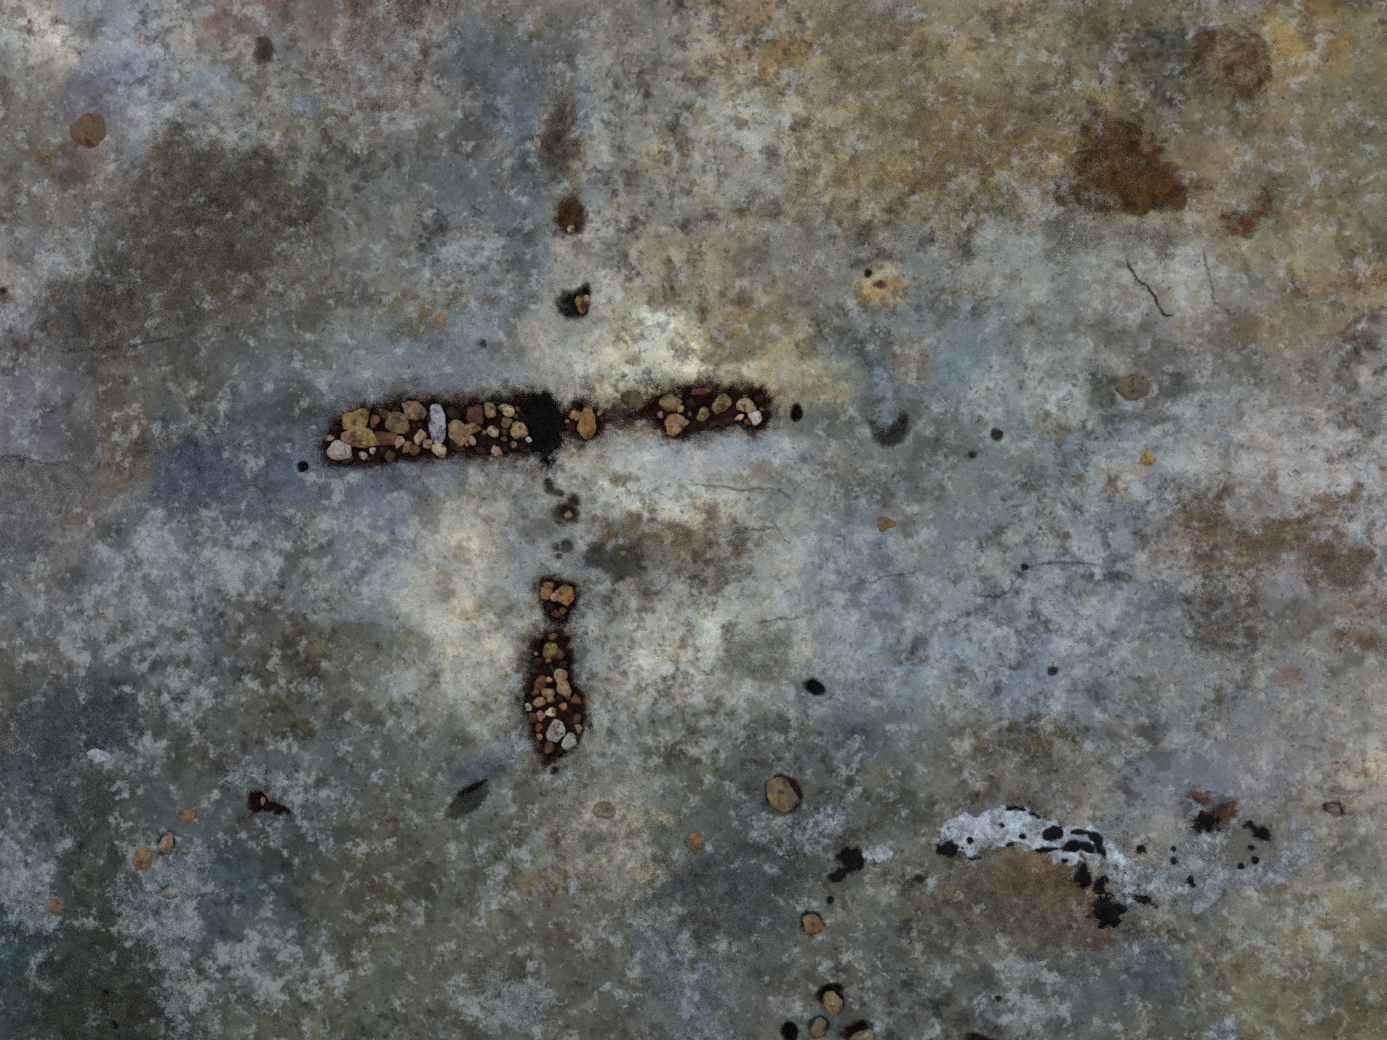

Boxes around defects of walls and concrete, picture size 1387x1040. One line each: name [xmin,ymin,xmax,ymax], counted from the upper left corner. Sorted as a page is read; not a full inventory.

corrosion [1054,119,1202,216]
spalling [298,381,802,774]
efflorescence [936,805,1321,914]